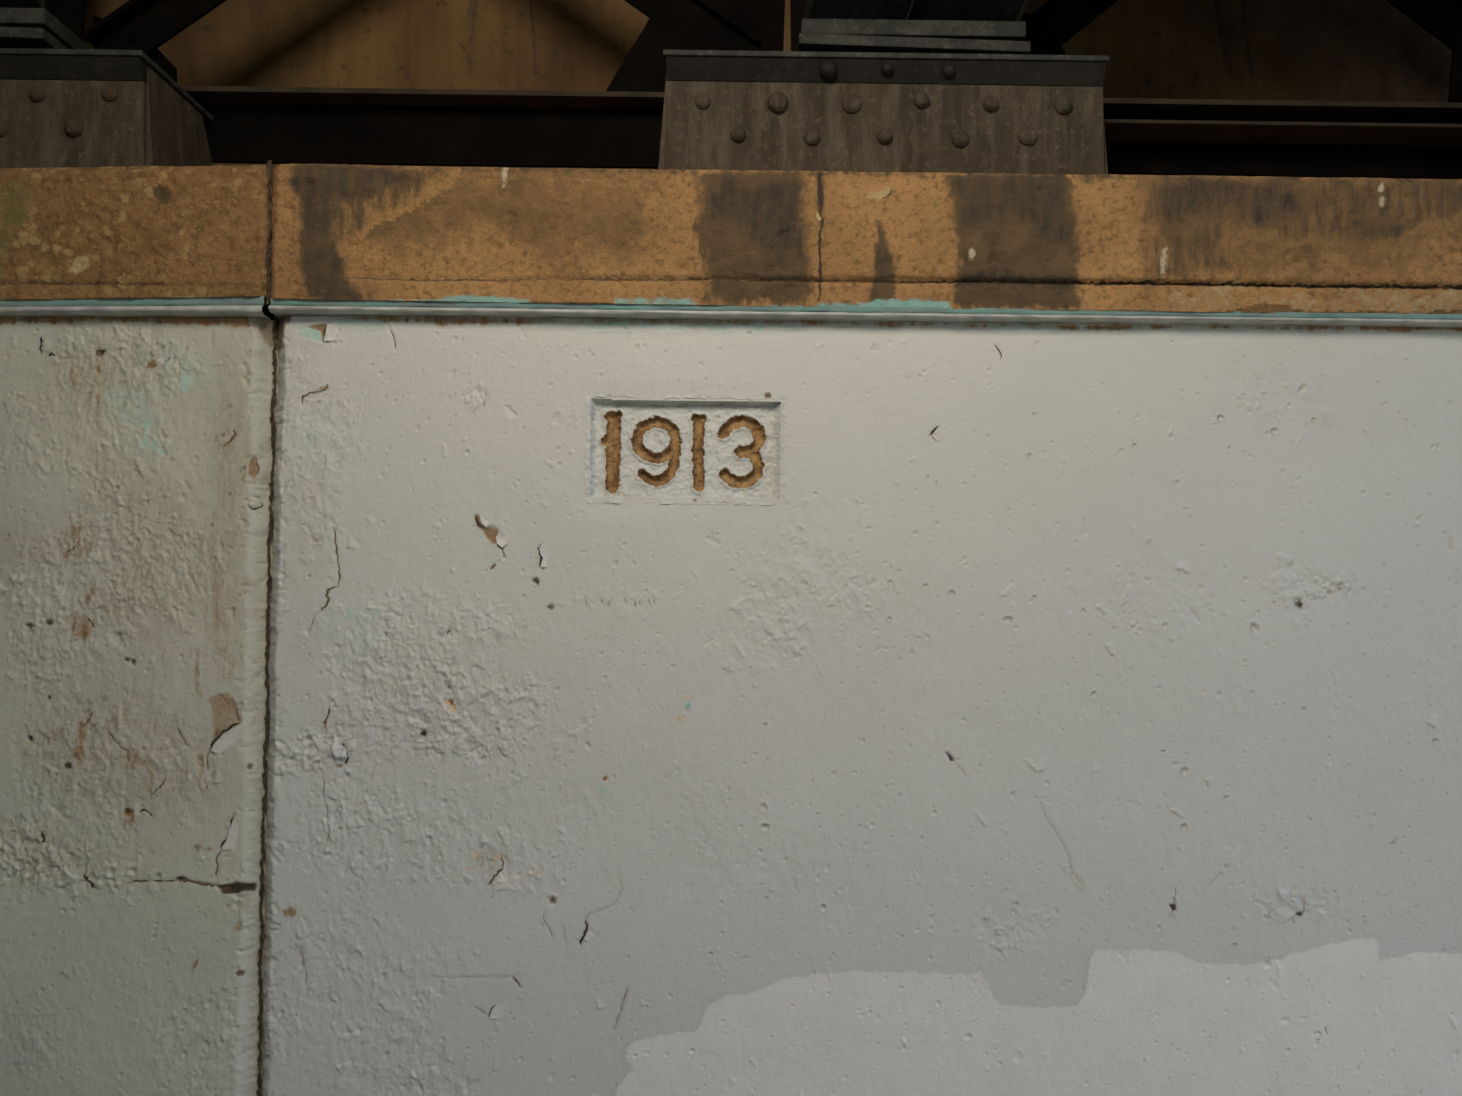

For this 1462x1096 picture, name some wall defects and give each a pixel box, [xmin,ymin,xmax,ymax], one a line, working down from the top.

water stain [248,164,814,357]
water stain [936,173,1086,293]
water stain [730,320,954,331]
crack [127,813,238,887]